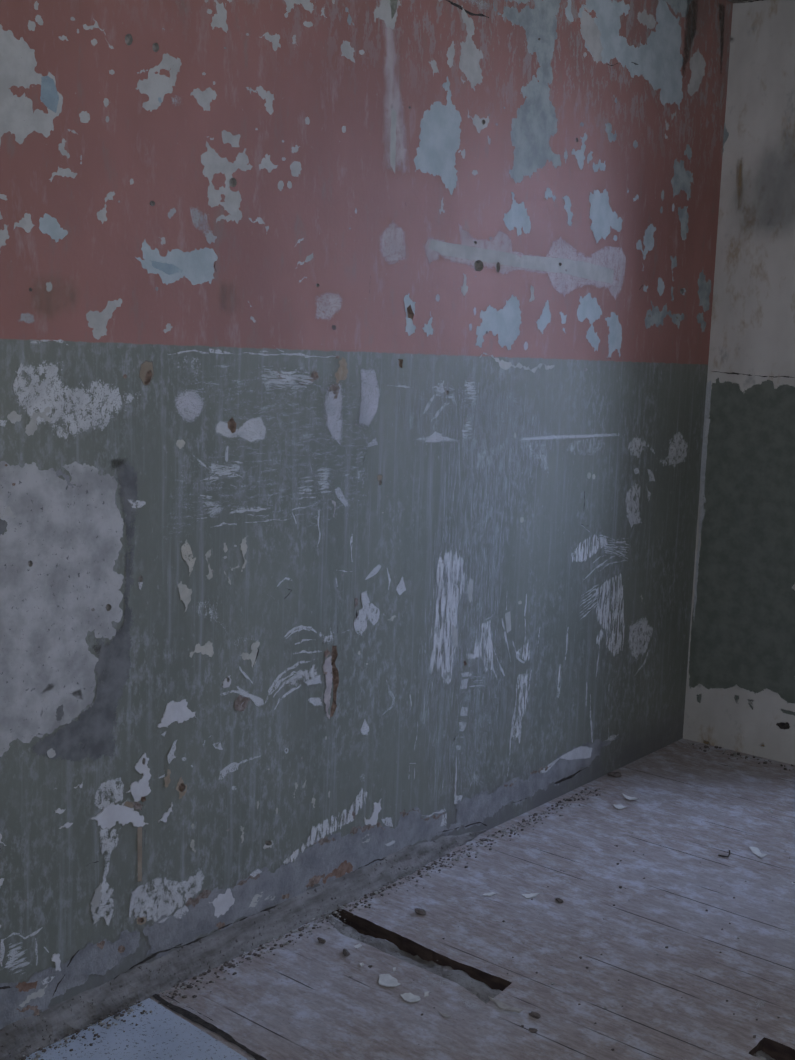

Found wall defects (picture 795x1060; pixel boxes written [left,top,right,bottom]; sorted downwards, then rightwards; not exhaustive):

peeling [0,1,90,181]
peeling [59,17,133,49]
peeling [136,43,217,112]
peeling [246,86,274,115]
spalling [373,0,401,29]
peeling [414,0,706,243]
peeling [135,130,302,291]
peeling [0,360,154,441]
peeling [0,461,124,757]
peeling [688,378,795,716]
peeling [157,699,196,728]
spalling [0,734,621,1029]